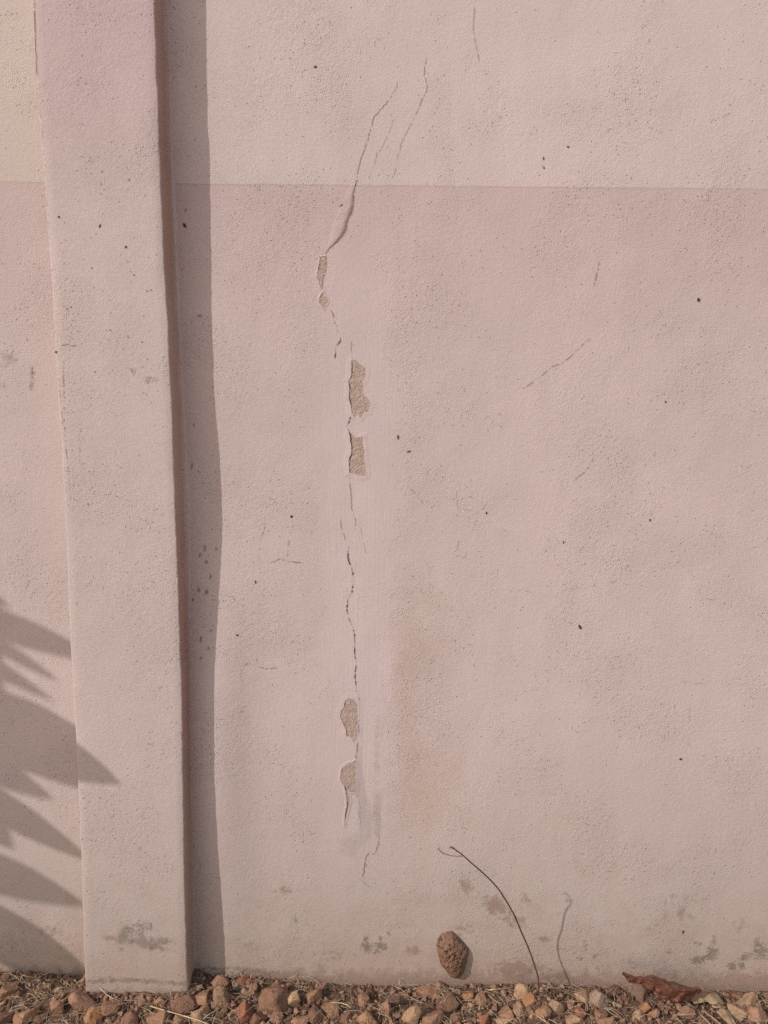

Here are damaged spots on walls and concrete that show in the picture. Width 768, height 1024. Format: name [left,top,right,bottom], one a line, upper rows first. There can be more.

crack [316,86,397,288]
peeling [315,255,330,311]
peeling [343,354,376,482]
peeling [335,692,364,828]